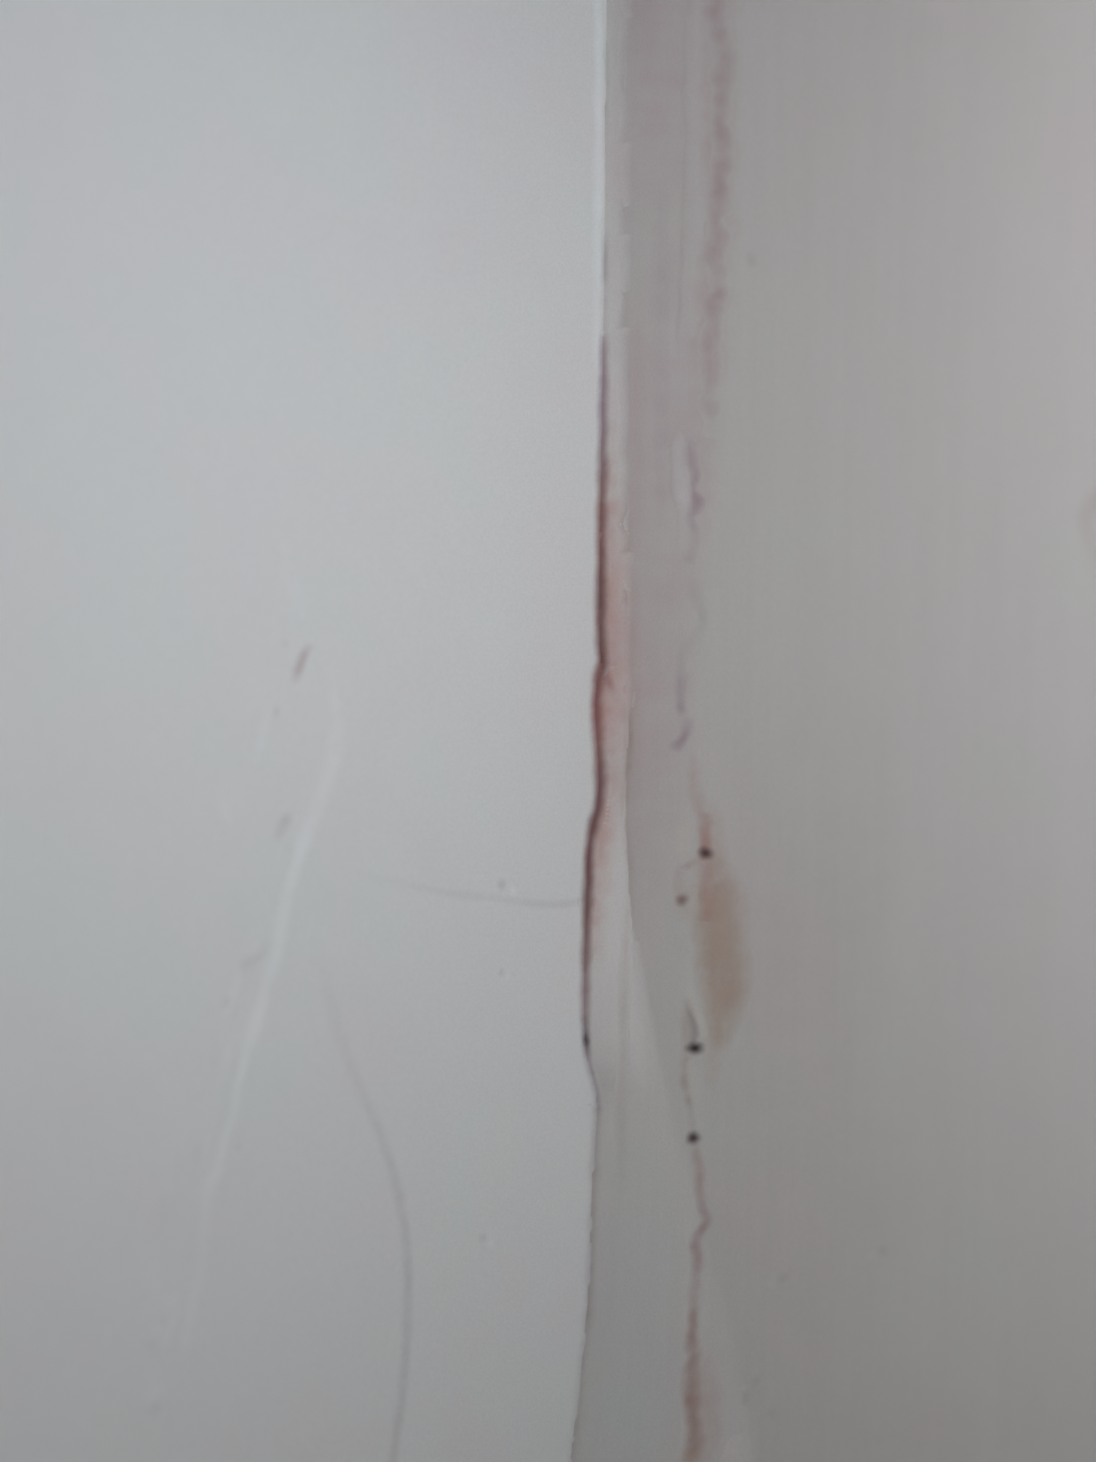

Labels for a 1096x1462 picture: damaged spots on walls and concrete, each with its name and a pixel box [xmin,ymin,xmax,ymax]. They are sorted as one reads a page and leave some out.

crack [564,228,622,1462]
water stain [606,0,711,943]
rust [675,1144,727,1462]
rust [670,801,754,1092]